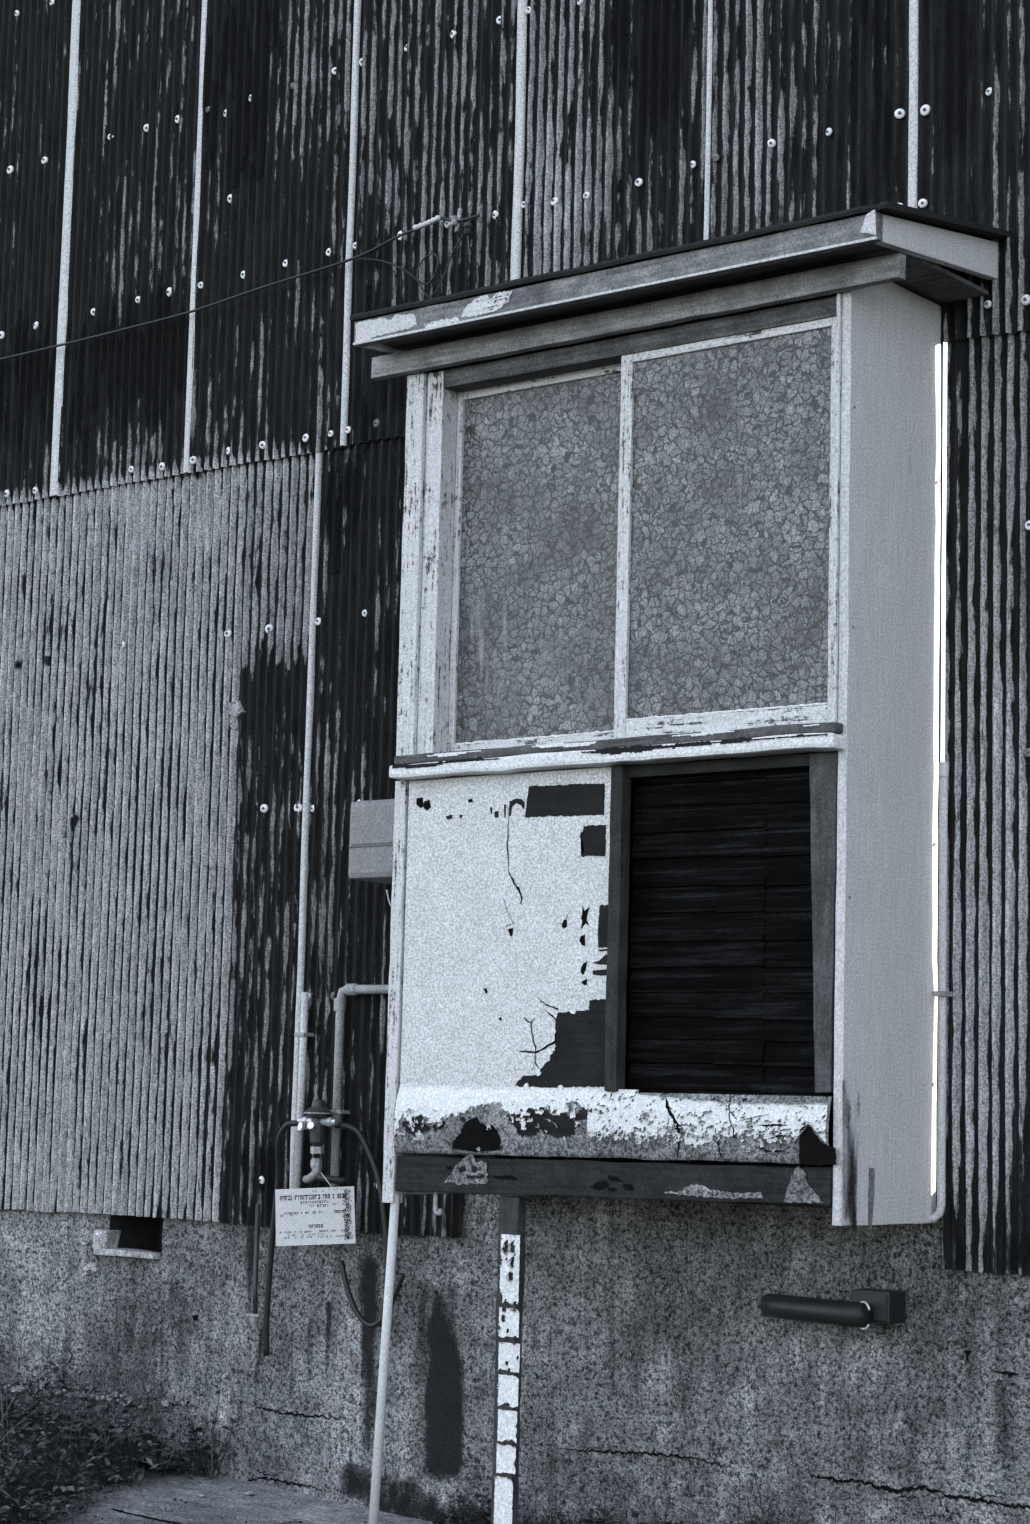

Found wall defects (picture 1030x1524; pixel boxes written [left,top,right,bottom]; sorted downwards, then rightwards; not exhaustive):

crack [503,802,523,929]
peeling [592,905,608,976]
peeling [394,999,828,1155]
crack [809,1474,1030,1520]